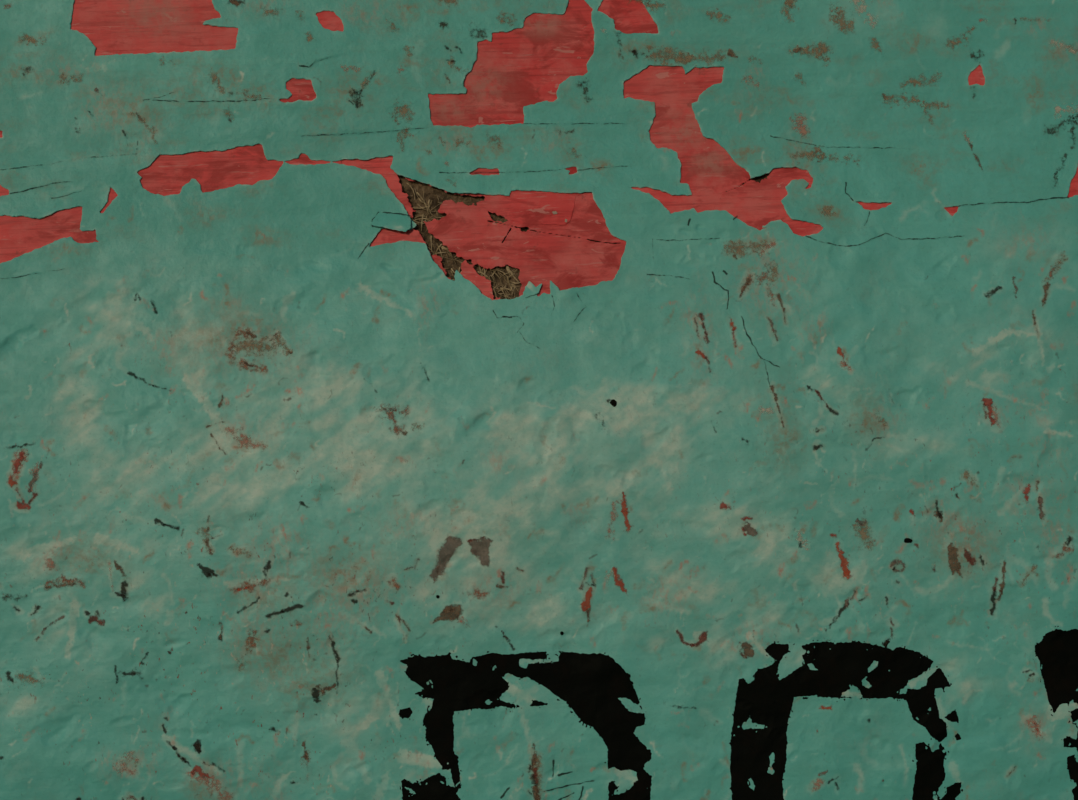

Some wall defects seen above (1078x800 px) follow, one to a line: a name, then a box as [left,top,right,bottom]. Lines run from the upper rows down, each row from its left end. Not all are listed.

peeling [71,0,238,56]
peeling [428,0,658,128]
peeling [0,206,99,263]
peeling [137,144,626,300]
peeling [623,65,823,236]
crack [806,182,962,247]
crack [957,197,1069,207]
peeling [1067,167,1078,198]